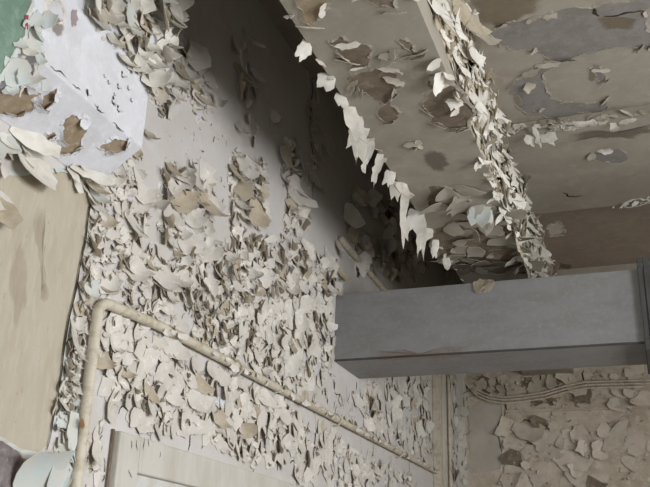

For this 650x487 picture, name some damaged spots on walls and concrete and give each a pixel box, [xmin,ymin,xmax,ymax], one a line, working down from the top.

flaking render [0,0,66,121]
peeling [87,0,229,141]
peeling [295,39,312,62]
peeling [283,0,331,29]
peeling [315,58,336,92]
peeling [325,0,650,284]
flaking render [0,111,436,487]
peeling [450,365,650,487]